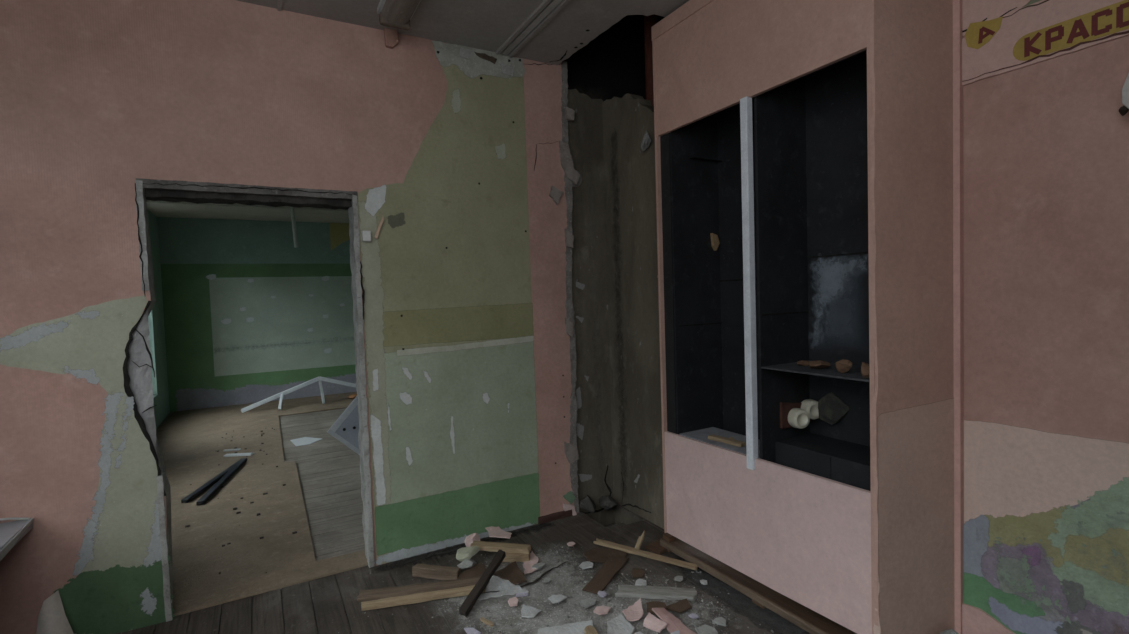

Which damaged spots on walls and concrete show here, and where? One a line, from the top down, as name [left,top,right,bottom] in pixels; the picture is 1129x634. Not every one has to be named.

peeling [0,295,177,634]
peeling [175,41,540,565]
spalling [549,15,665,513]
peeling [964,477,1129,634]